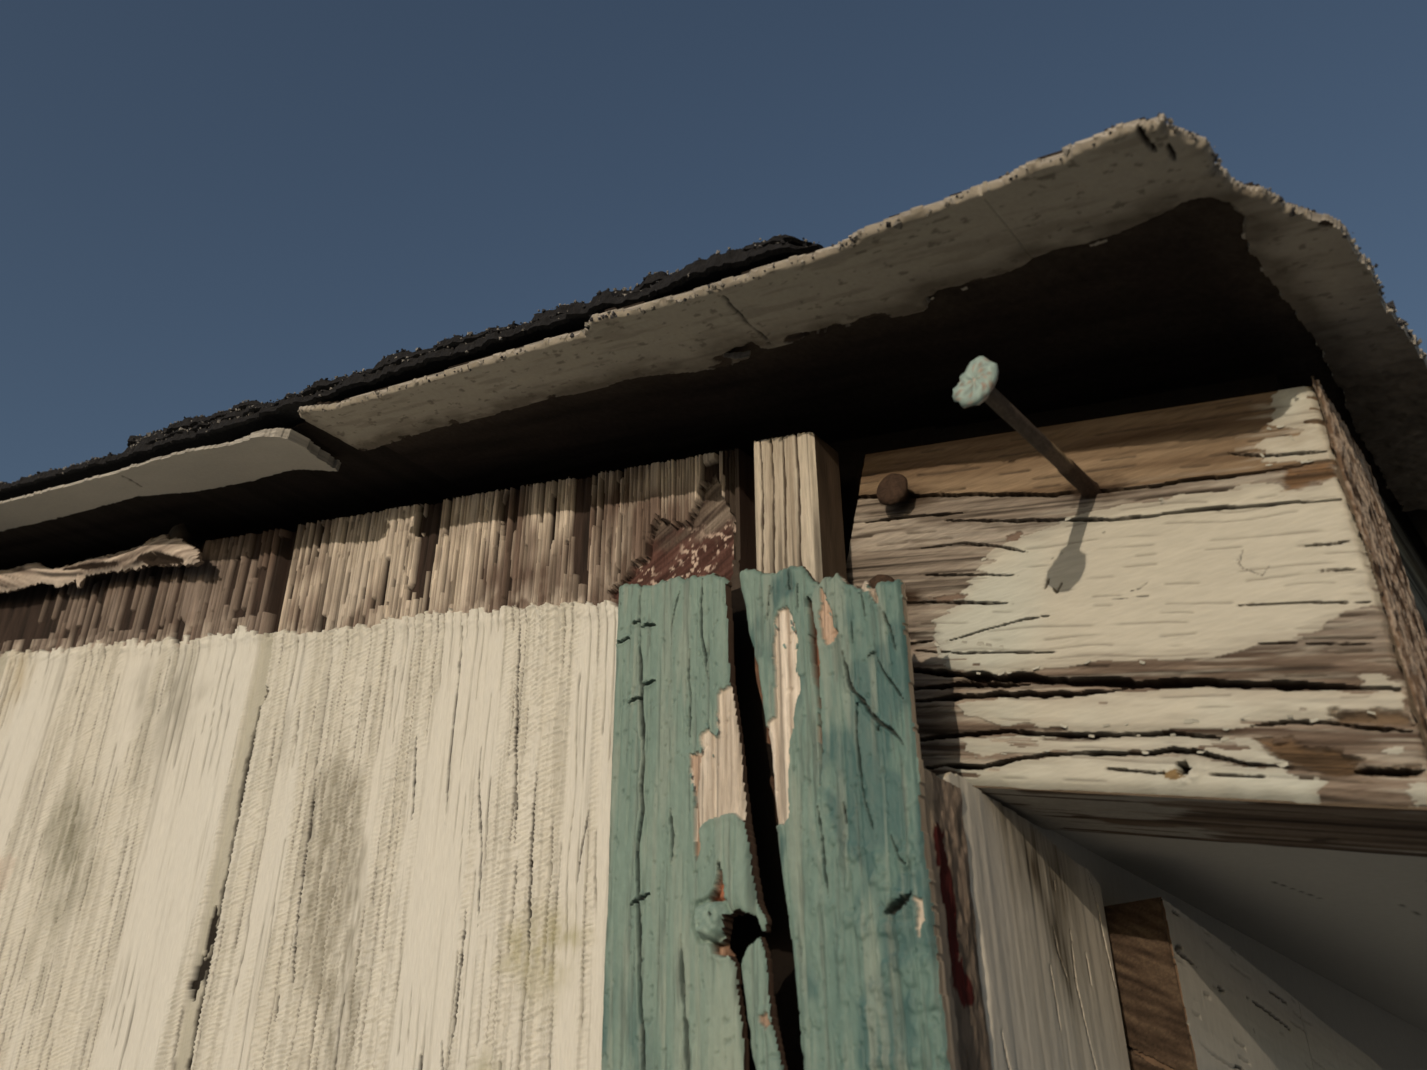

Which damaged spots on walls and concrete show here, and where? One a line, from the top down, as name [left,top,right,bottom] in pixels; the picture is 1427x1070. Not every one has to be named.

peeling [0,448,741,657]
peeling [690,685,747,855]
peeling [766,605,800,824]
peeling [818,586,839,645]
crack [760,436,1425,874]
peeling [846,387,1427,807]